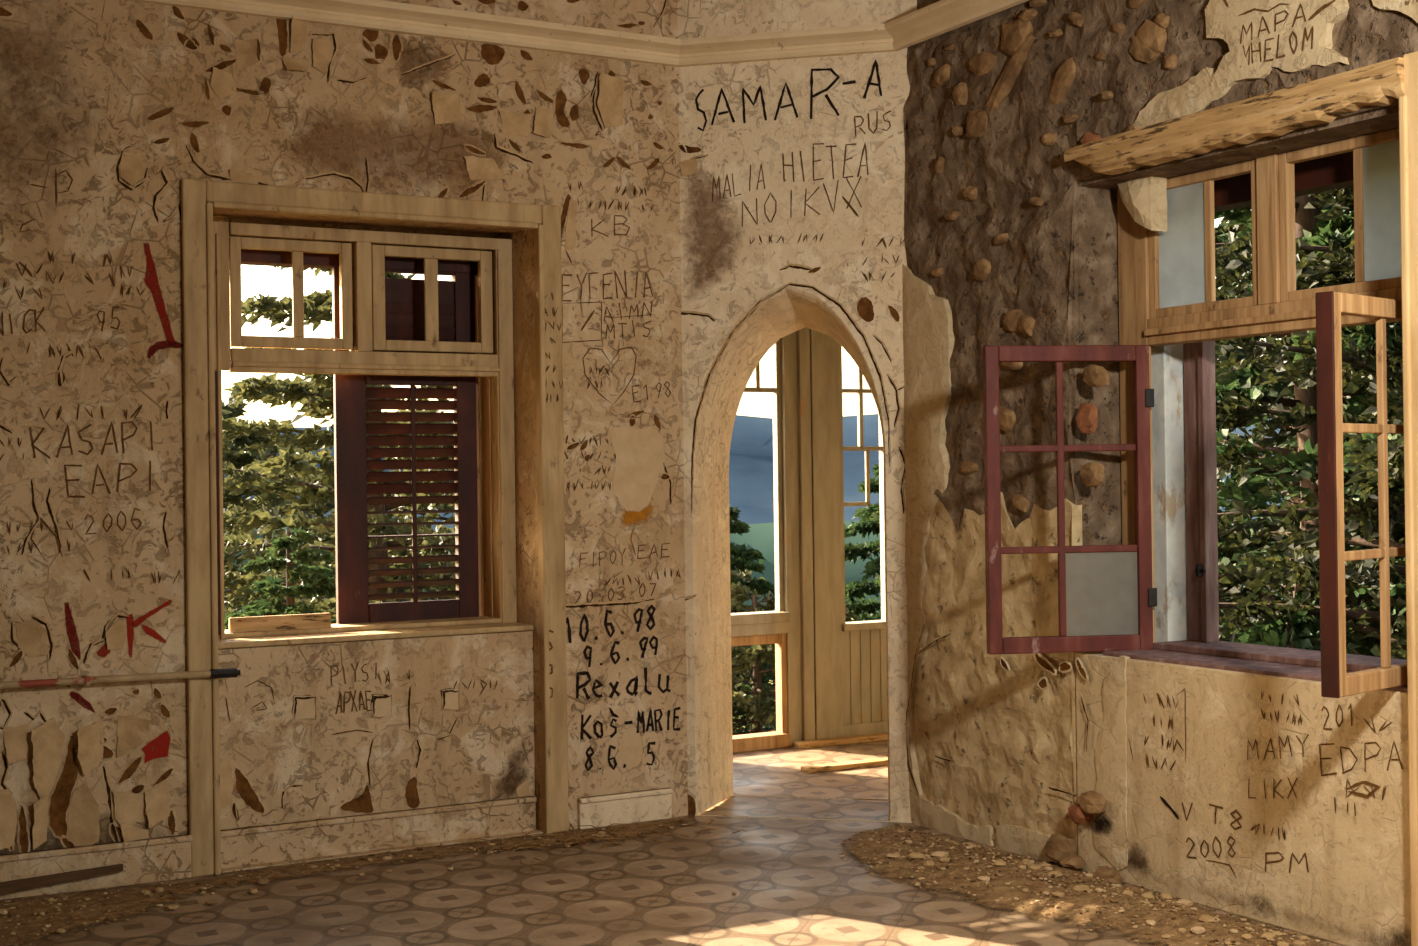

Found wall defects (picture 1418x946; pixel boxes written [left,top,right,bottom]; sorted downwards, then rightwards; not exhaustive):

spalling [1203,0,1418,111]
spalling [1334,99,1399,121]
water stain [691,190,729,284]
spalling [904,0,1230,884]
flaking render [0,686,178,853]